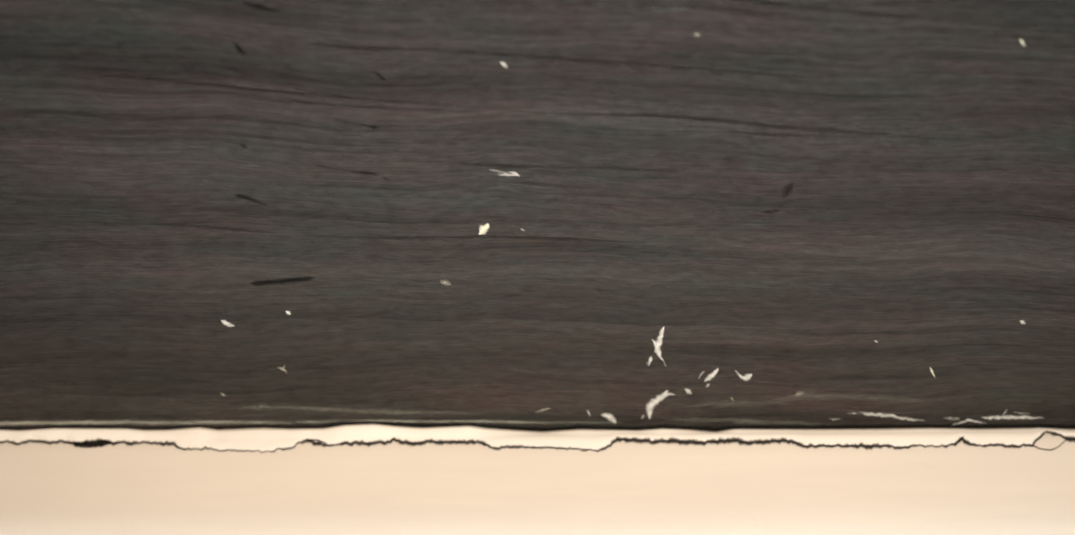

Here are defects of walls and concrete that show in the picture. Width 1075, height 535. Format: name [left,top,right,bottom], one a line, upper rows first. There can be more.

crack [0,431,1075,453]